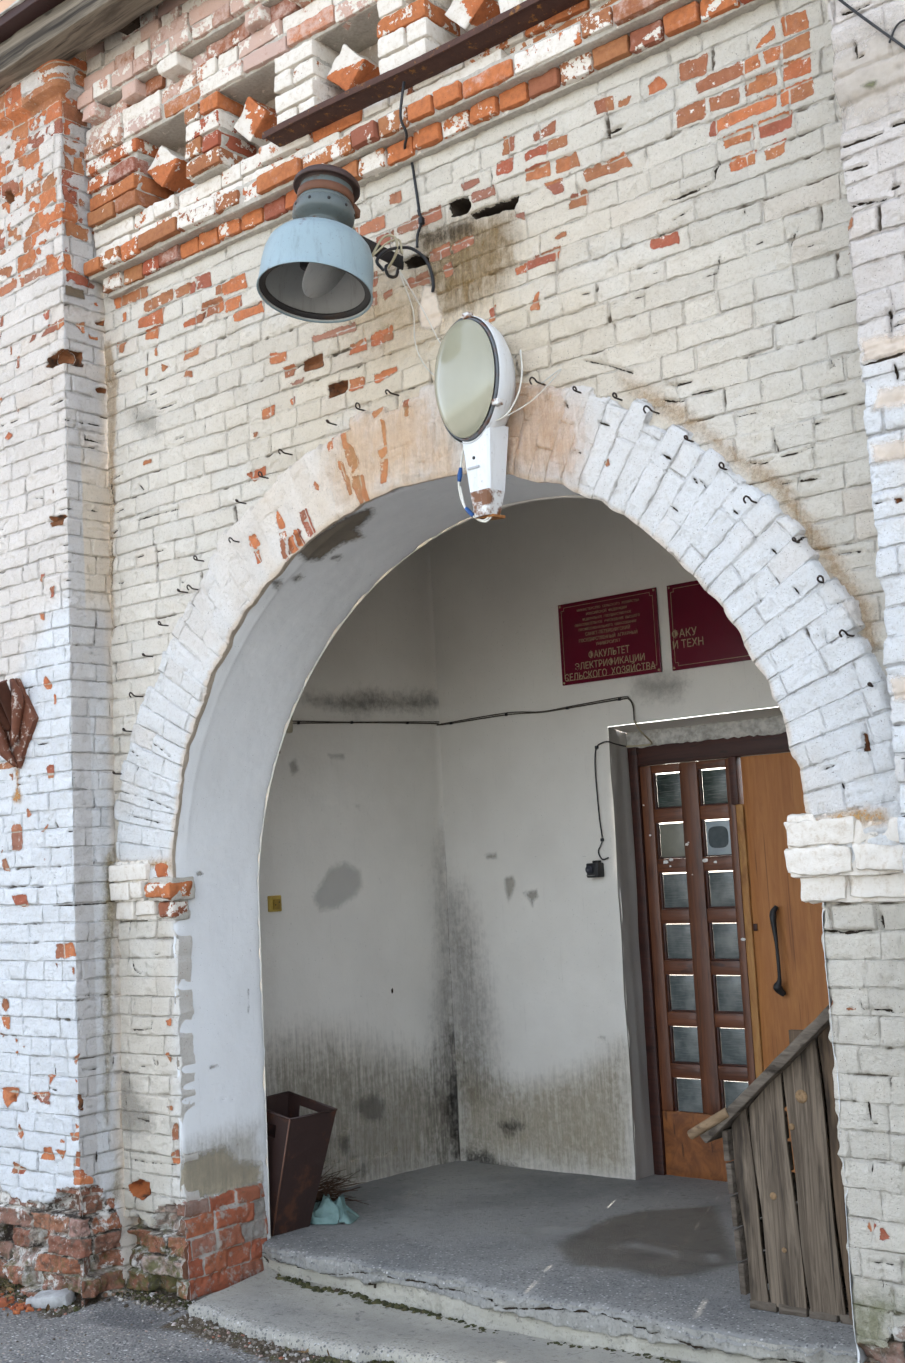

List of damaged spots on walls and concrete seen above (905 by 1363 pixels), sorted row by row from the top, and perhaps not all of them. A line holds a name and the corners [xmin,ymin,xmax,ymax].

peeling [0,57,264,377]
leakage [425,218,510,304]
peeling [0,998,25,1055]
leakage [265,1053,618,1184]
spalling [0,1054,269,1309]
crack [262,1252,802,1363]
spalling [857,1324,905,1363]